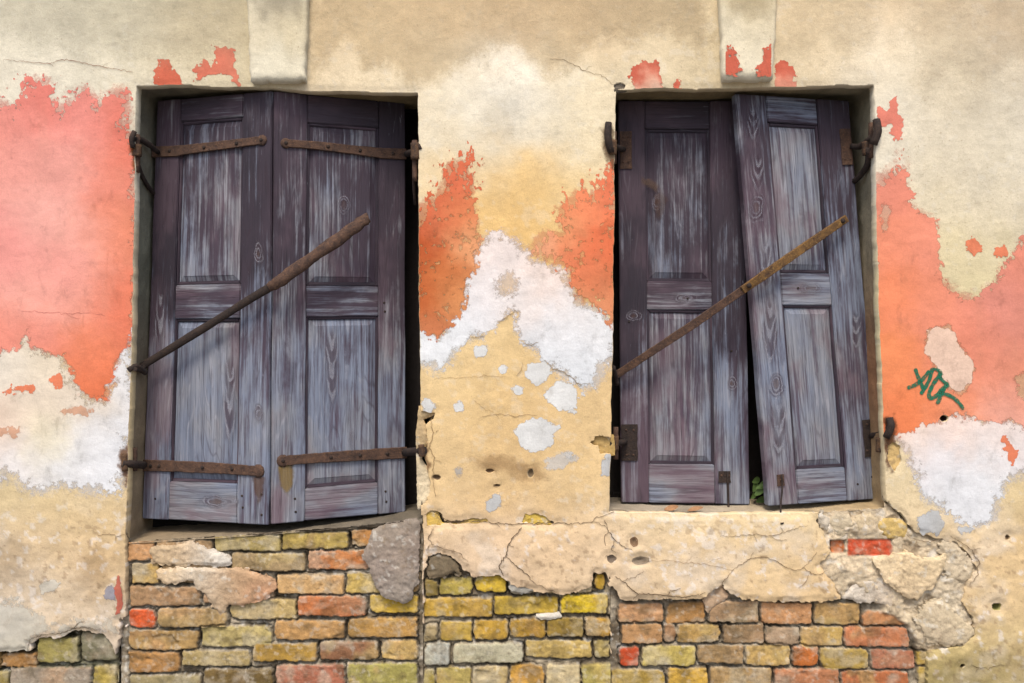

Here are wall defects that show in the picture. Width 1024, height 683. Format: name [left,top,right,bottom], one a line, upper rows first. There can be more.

peeling [153,45,241,87]
peeling [614,60,682,93]
peeling [726,39,798,87]
peeling [877,96,904,141]
peeling [0,73,135,505]
spalling [0,141,1024,683]
crack [425,415,828,598]